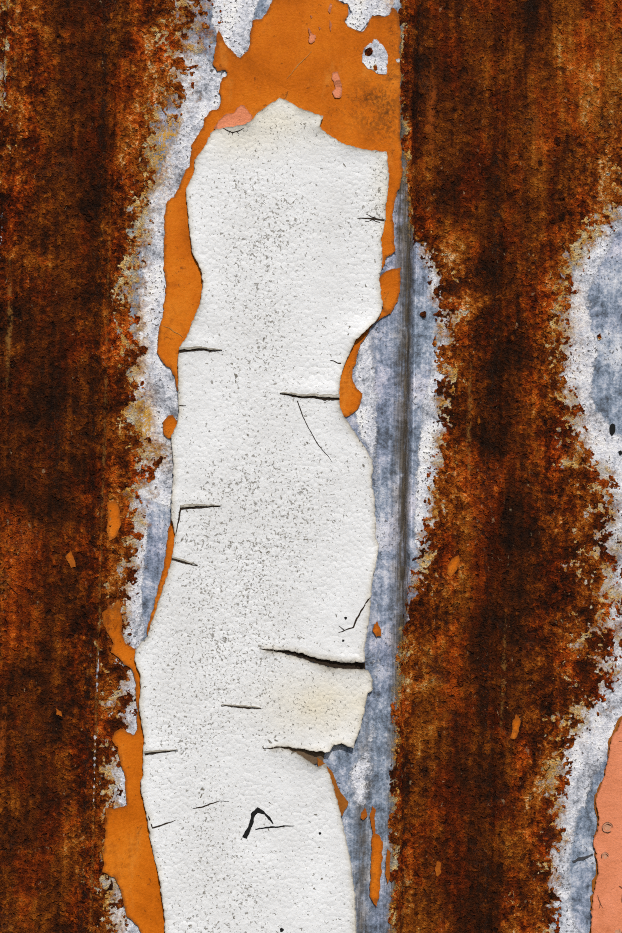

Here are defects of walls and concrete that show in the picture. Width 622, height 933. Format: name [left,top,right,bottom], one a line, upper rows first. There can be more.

peeling [308,3,332,44]
peeling [332,72,342,98]
crack [179,345,222,353]
crack [280,392,340,460]
corrosion [0,0,259,933]
corrosion [339,0,622,933]
peeling [106,501,121,541]
crack [176,504,221,533]
peeling [134,98,401,933]
crack [259,648,366,669]
crack [263,746,325,764]
peeling [589,716,622,933]